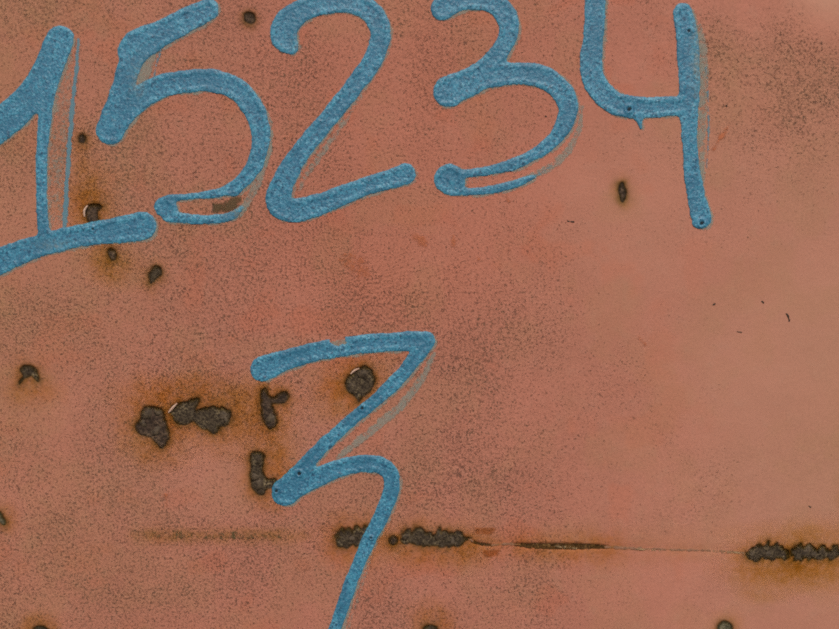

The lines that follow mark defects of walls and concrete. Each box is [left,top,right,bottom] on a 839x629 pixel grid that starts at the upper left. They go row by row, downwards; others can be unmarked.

crack [469,539,745,554]